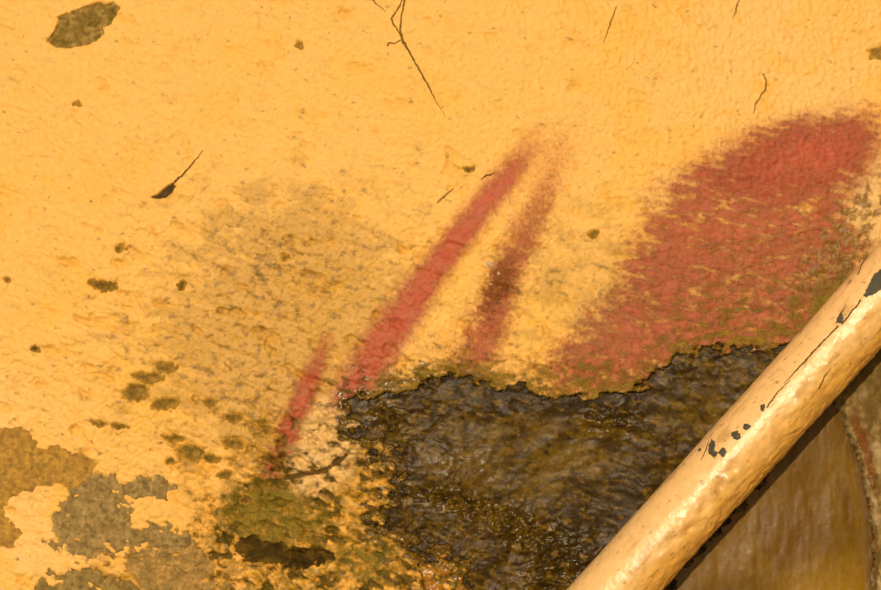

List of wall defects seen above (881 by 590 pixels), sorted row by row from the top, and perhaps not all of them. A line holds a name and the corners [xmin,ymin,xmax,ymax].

peeling [49,3,120,49]
crack [372,0,444,113]
flaking render [90,419,130,430]
peeling [0,427,221,590]
flaking render [121,361,180,412]
flaking render [160,433,244,480]
flaking render [223,411,243,423]
flaking render [234,535,335,569]
leakage [320,309,806,590]
flaking render [339,342,789,590]
leakage [674,402,875,590]
spalling [833,349,881,590]